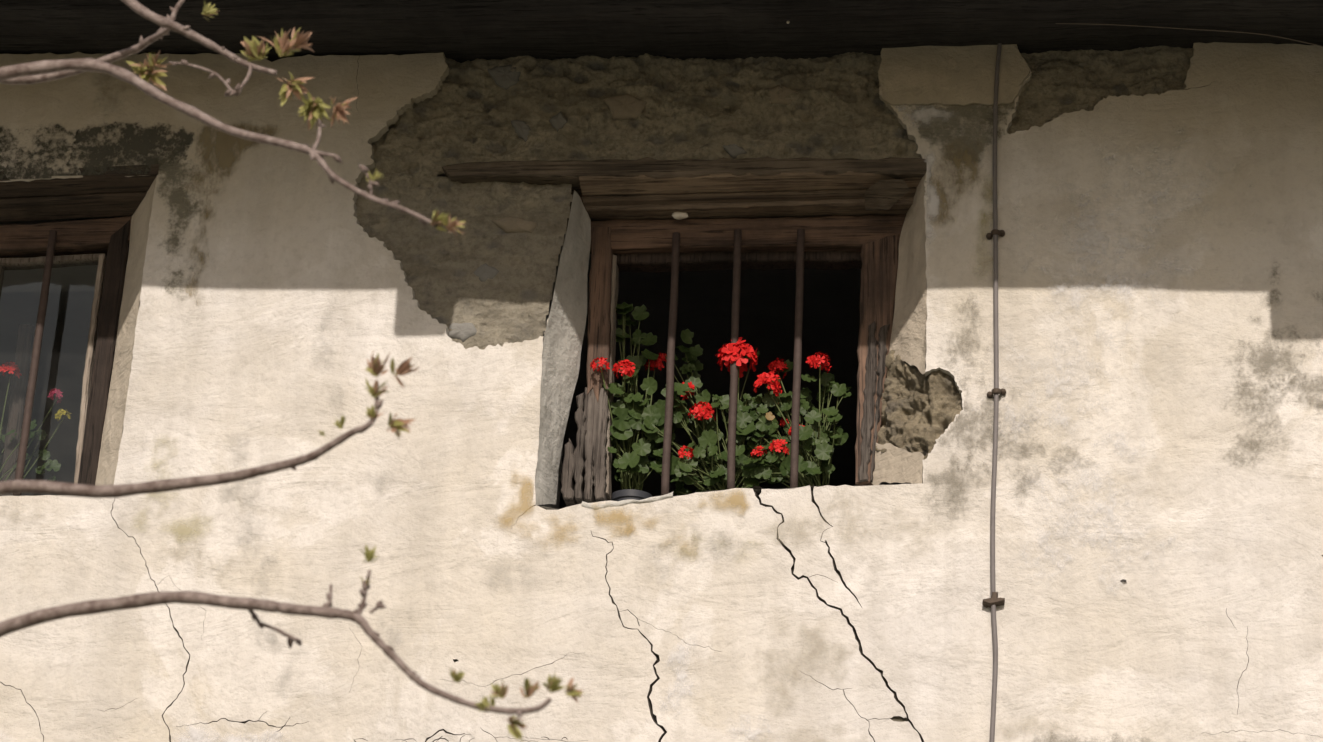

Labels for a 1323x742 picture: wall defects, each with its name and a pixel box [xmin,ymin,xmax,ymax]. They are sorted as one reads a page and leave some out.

flaking render [1007,46,1193,134]
damp [0,122,274,252]
flaking render [355,52,921,350]
damp [899,101,1015,232]
flaking render [875,350,963,459]
damp [1251,349,1323,407]
crack [591,532,722,742]
crack [753,484,924,742]
crack [0,682,44,742]